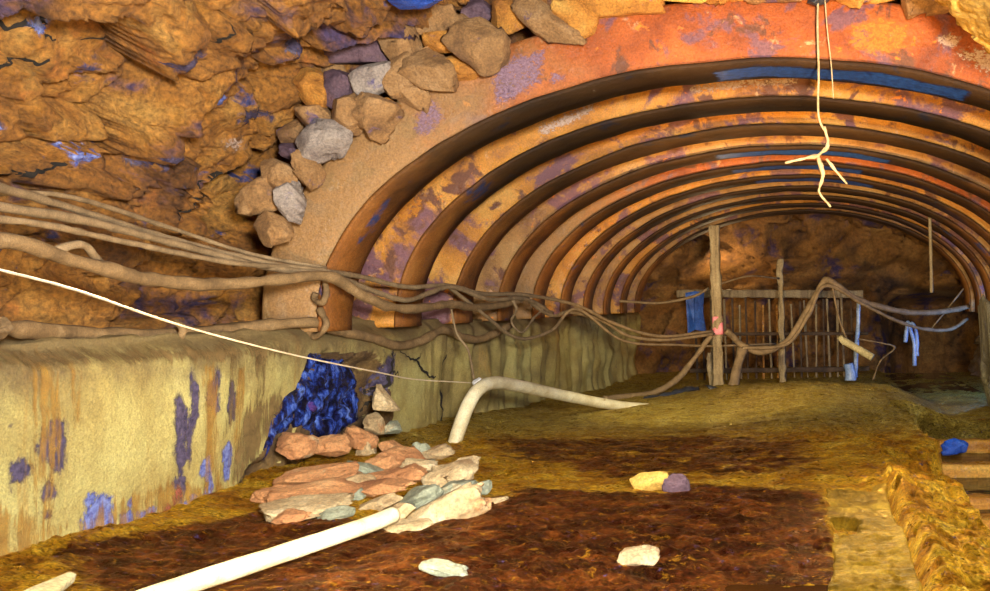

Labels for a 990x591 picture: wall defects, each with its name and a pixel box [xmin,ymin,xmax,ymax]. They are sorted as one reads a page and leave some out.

rust [398,197,422,221]
crack [360,350,447,421]